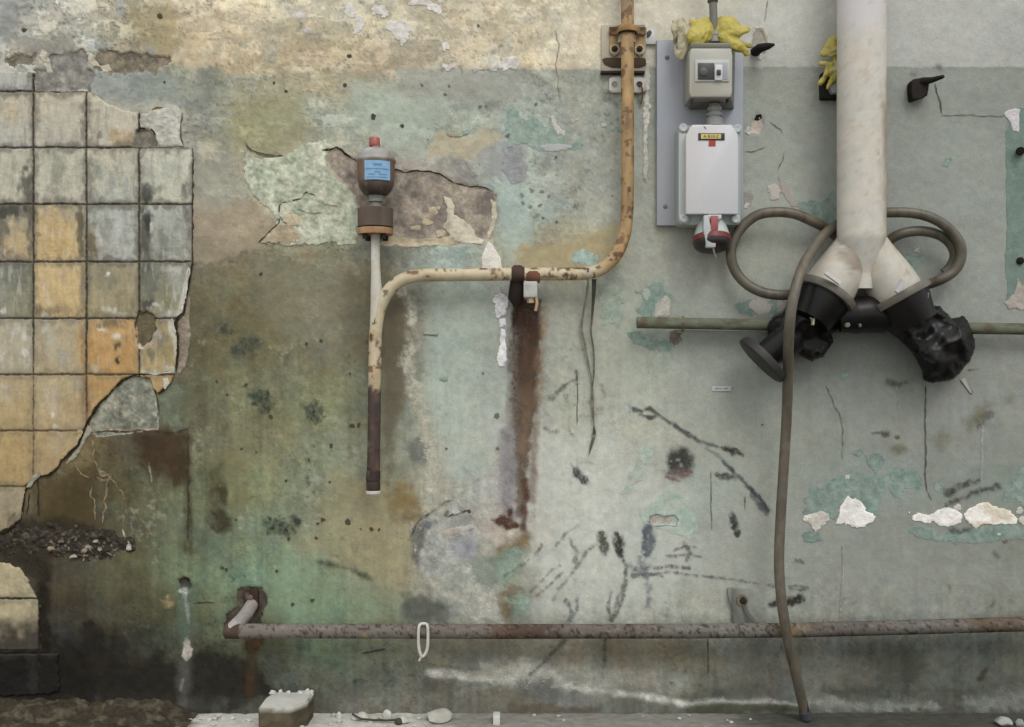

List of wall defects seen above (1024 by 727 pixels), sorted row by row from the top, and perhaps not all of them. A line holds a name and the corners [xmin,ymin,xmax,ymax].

spalling [4,48,171,92]
crack [935,84,1002,117]
crack [323,146,353,160]
flaking render [243,139,502,268]
spalling [89,262,193,437]
rust [495,299,544,557]
crack [826,386,844,459]
crack [924,385,932,500]
peeling [802,449,944,542]
peeling [907,502,1024,544]
leakage [0,518,271,710]
leakage [426,658,912,712]